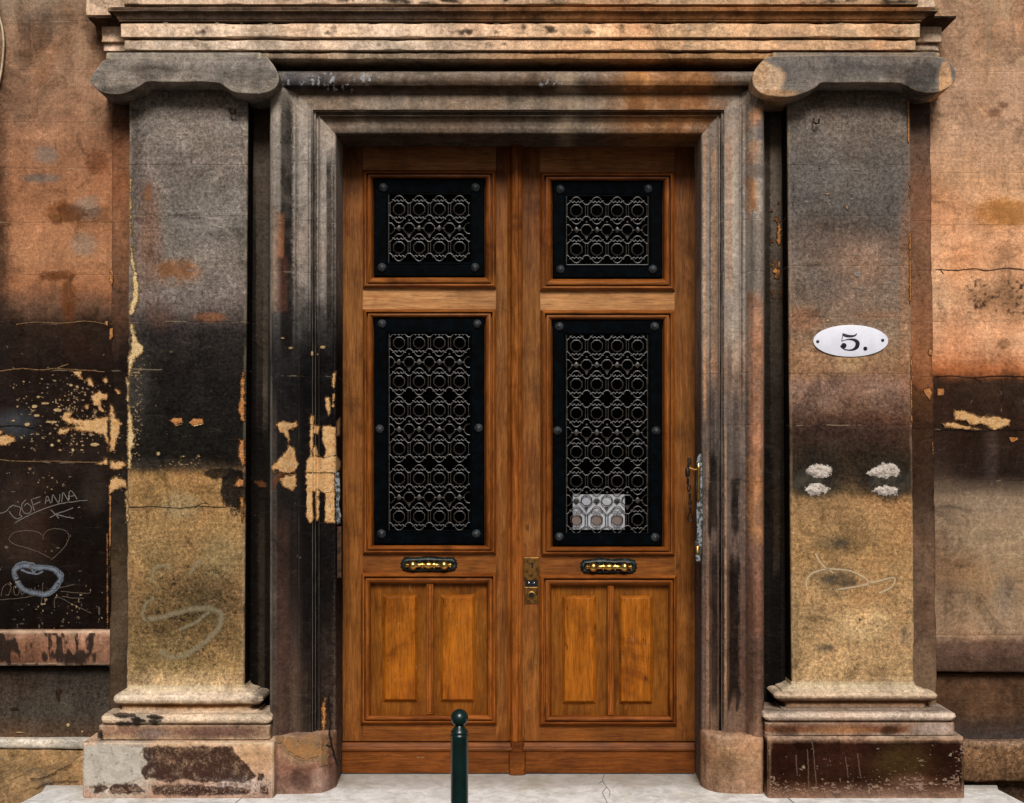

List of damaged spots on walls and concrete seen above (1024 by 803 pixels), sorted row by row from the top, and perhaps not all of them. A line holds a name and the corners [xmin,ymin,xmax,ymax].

crack [936,266,1024,274]
spalling [0,177,157,628]
spalling [169,417,204,427]
spalling [940,409,1018,442]
spalling [271,371,342,524]
water stain [795,471,821,492]
water stain [872,472,909,496]
spalling [112,712,163,726]
peeling [82,729,271,796]